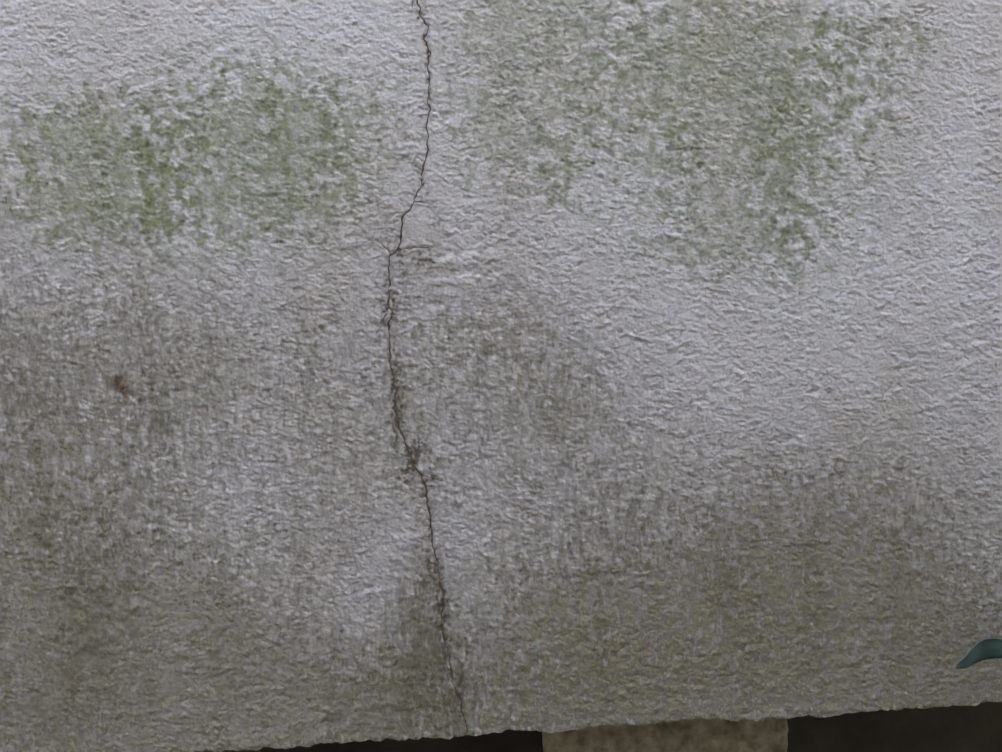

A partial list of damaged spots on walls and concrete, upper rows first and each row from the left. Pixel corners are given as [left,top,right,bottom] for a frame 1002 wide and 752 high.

crack [375,0,468,732]